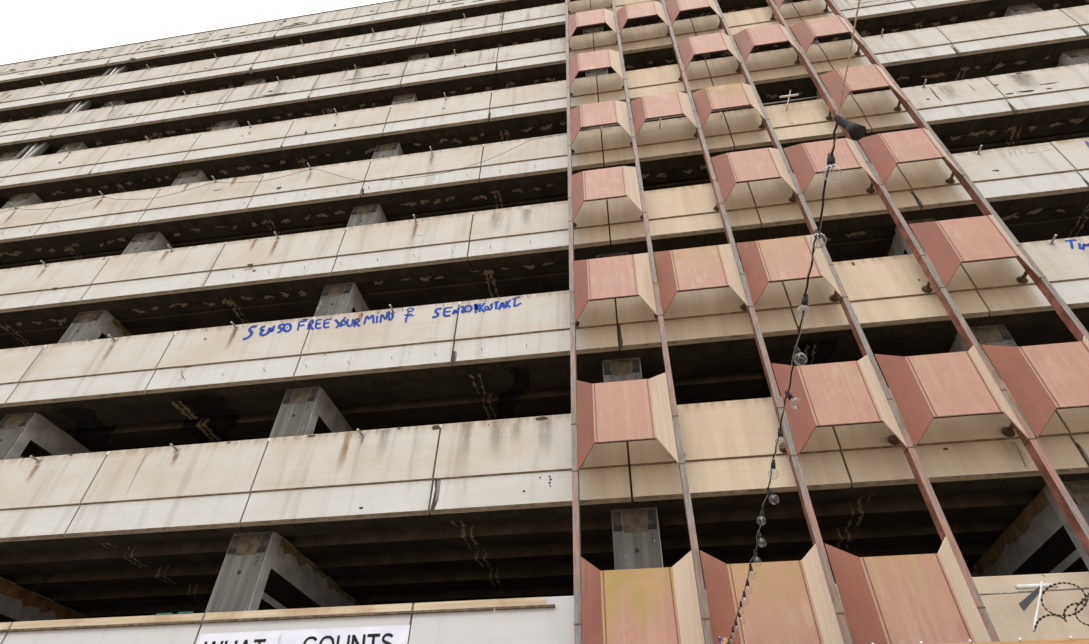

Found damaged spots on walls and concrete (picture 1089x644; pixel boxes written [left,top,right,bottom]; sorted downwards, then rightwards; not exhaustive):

peeling [0,578,89,620]